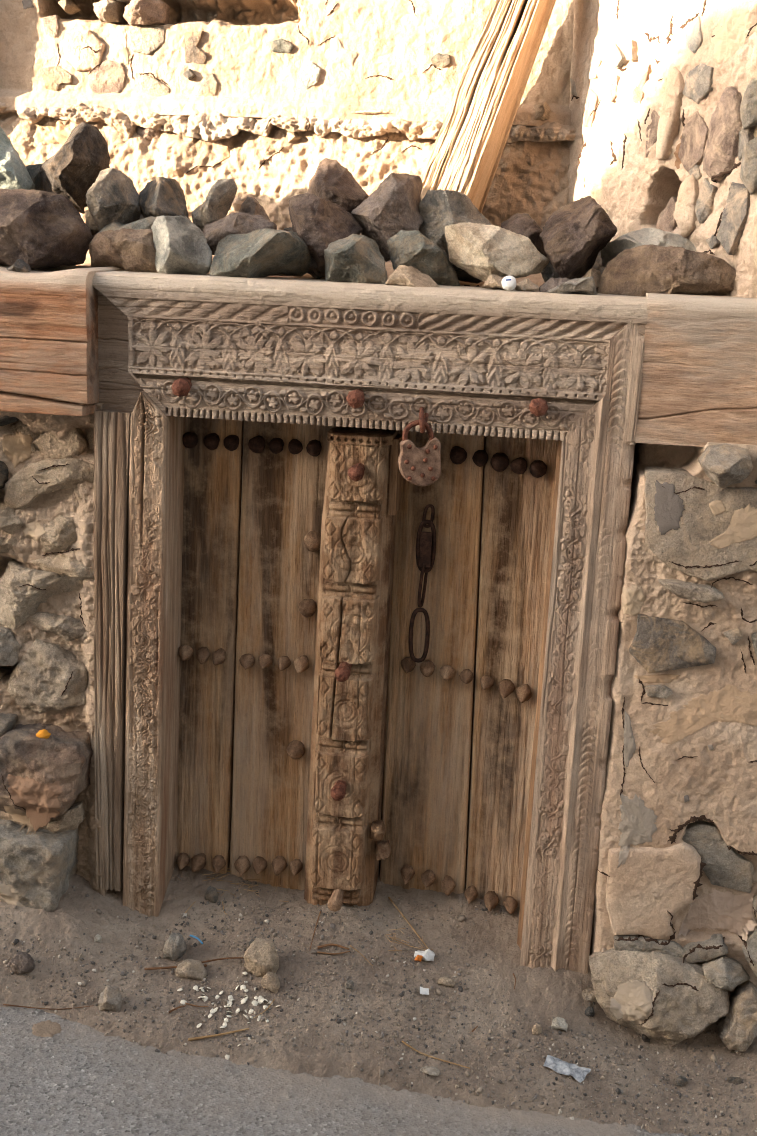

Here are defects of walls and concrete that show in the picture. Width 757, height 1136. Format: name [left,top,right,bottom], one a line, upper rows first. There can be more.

crack [297,0,338,45]